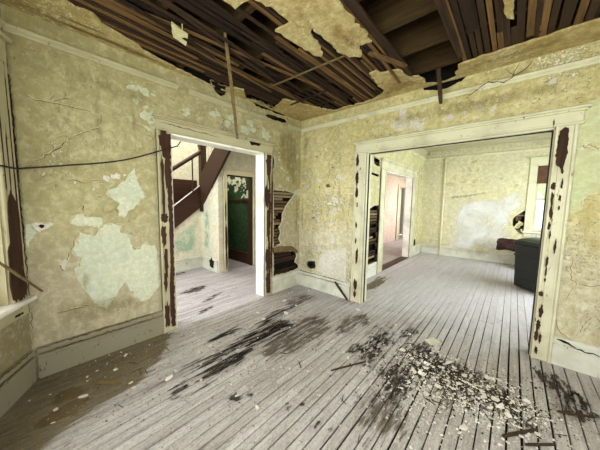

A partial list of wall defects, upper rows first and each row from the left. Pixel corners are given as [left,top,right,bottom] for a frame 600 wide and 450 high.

spalling [68,0,401,123]
crack [467,62,532,97]
peeling [0,62,55,302]
crack [0,46,163,387]
peeling [57,82,176,327]
peeling [265,151,309,293]
peeling [308,139,359,298]
peeling [453,184,525,249]
peeling [544,127,600,282]
peeling [534,291,544,354]
crack [556,316,600,357]